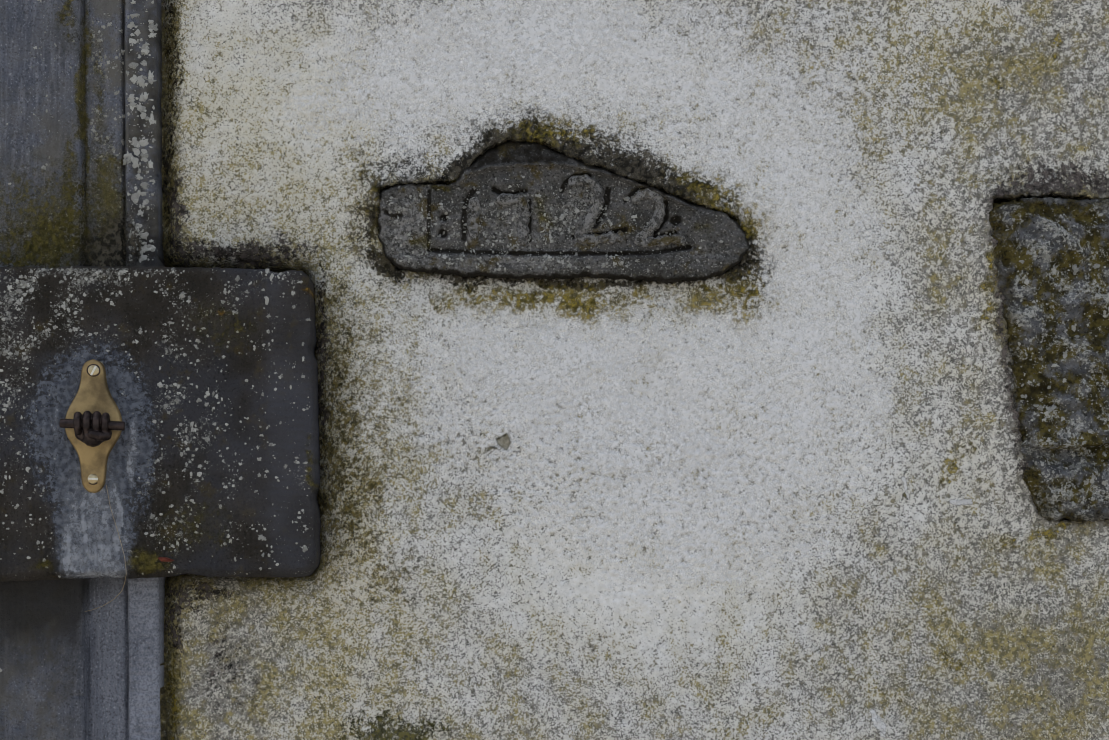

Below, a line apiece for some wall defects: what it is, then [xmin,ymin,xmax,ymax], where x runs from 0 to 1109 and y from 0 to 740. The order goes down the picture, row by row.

water stain [345,108,771,324]
water stain [22,336,159,579]